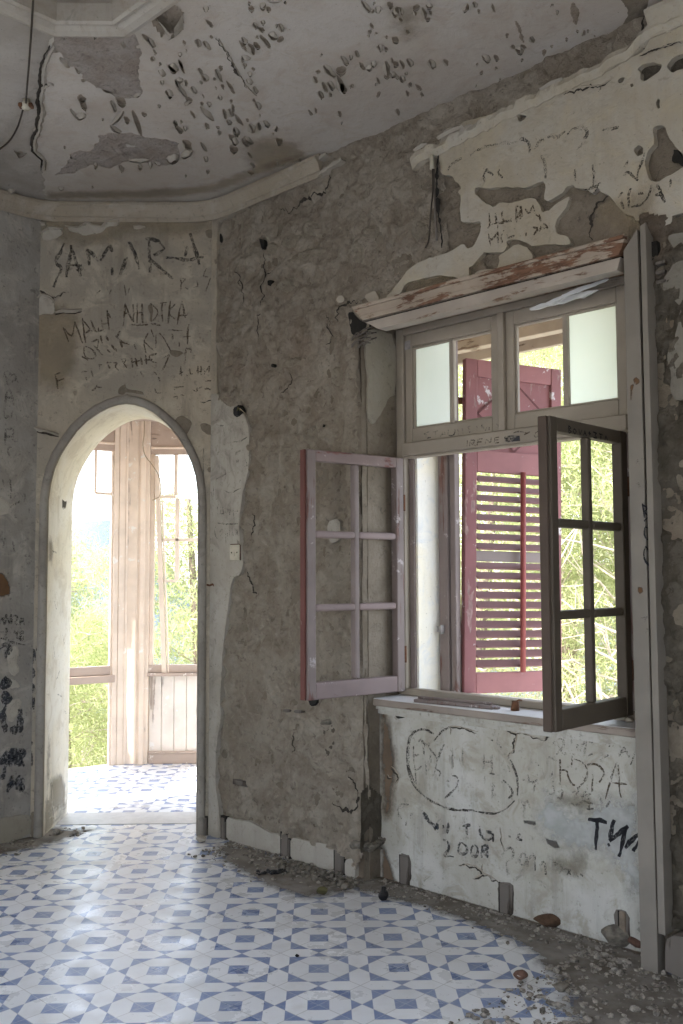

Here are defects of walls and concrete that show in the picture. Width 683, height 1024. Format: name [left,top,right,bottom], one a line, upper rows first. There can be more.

spalling [642,58,683,81]
peeling [0,0,284,200]
spalling [638,128,683,182]
crack [281,175,331,214]
crack [589,196,608,241]
flaking render [205,0,649,870]
flaking render [472,183,683,730]
crack [332,775,360,814]
flaking render [668,750,683,931]
crack [459,864,498,882]